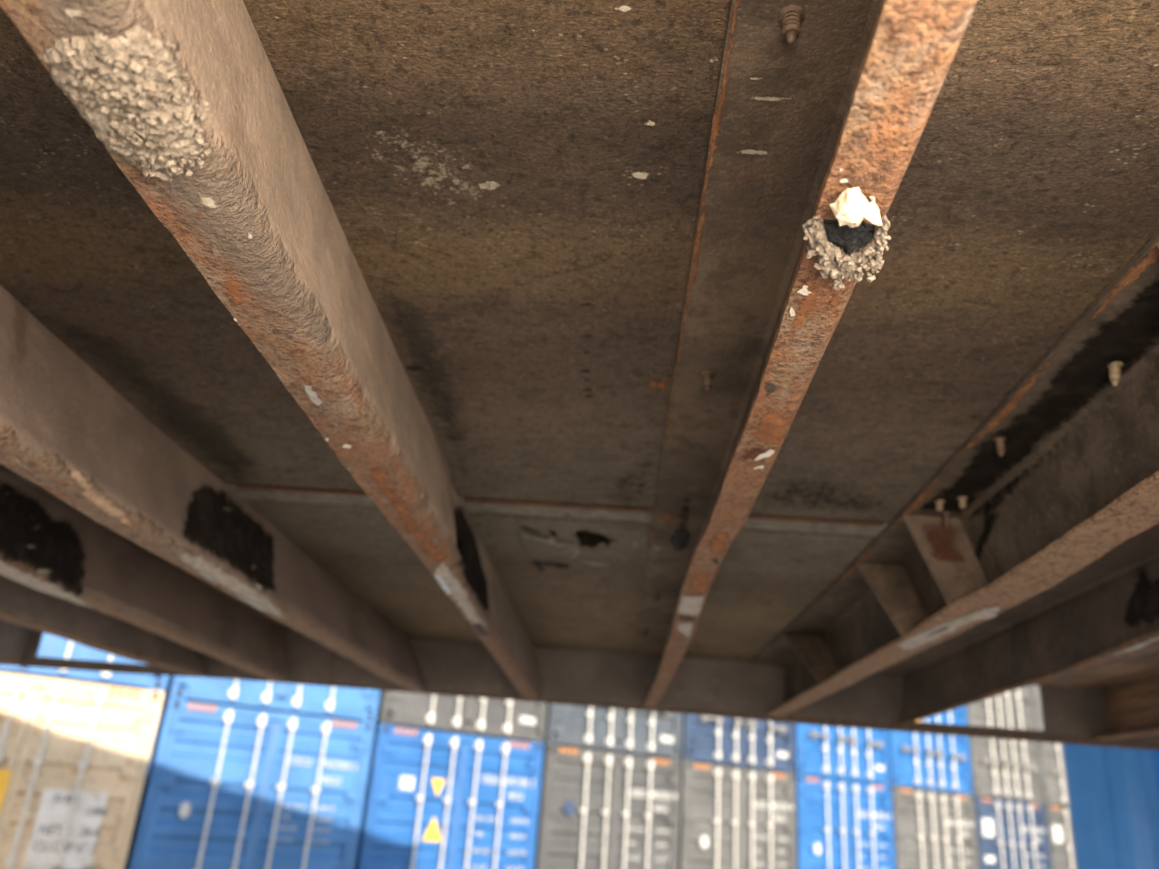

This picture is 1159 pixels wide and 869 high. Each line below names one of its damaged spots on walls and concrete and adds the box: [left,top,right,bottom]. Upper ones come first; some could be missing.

rust [638,0,738,443]
rust [791,279,845,328]
rust [1071,243,1159,339]
rust [739,352,1058,597]